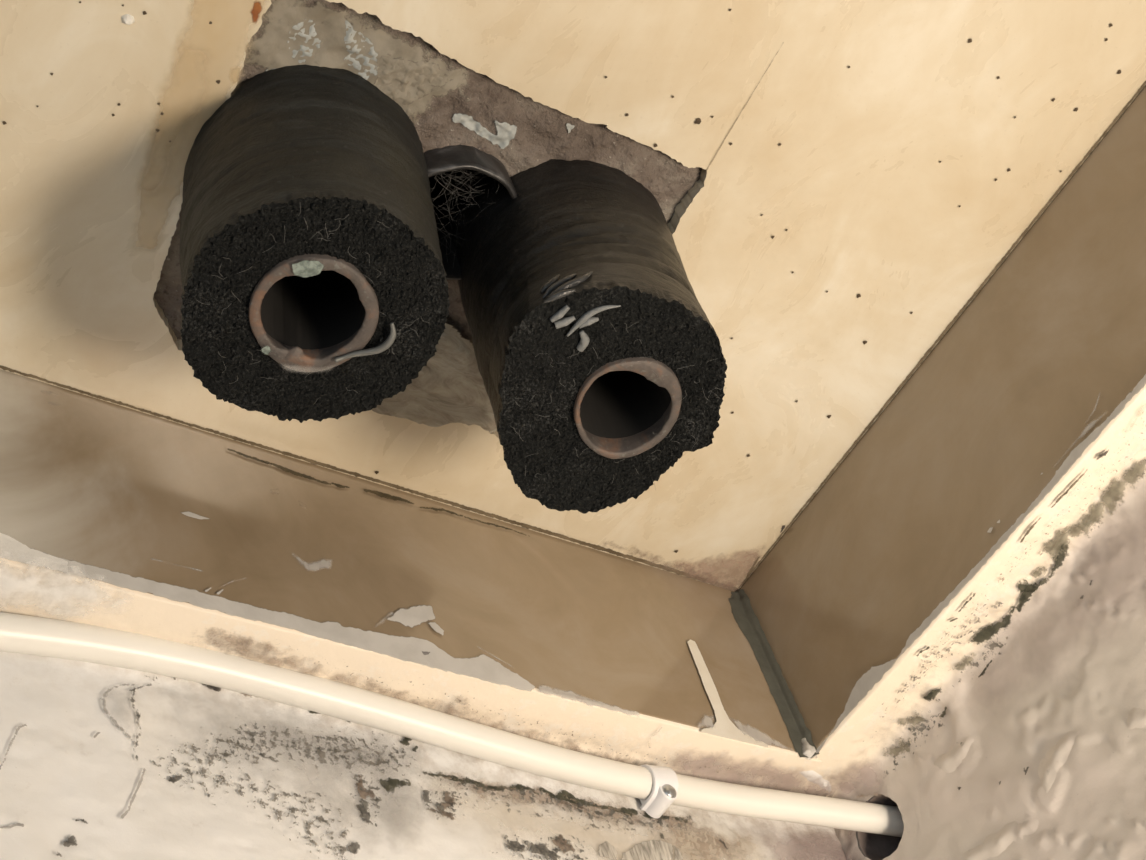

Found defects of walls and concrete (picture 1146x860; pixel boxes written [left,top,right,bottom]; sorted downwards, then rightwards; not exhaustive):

corrosion [251,2,262,22]
peeling [0,532,69,573]
water stain [840,432,1146,797]
water stain [214,635,316,674]
water stain [152,721,747,860]
water stain [663,757,827,795]